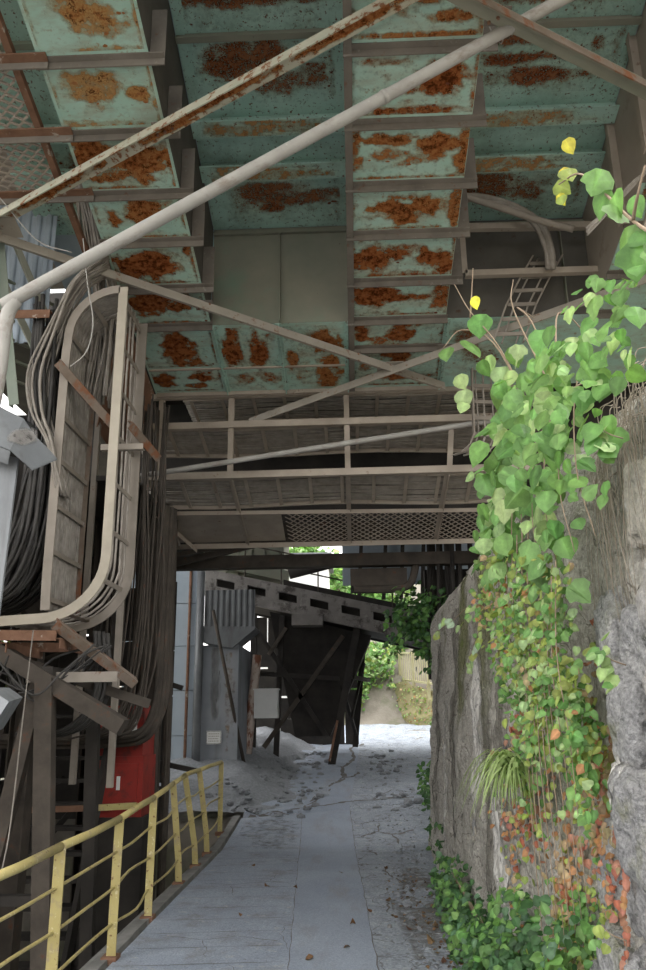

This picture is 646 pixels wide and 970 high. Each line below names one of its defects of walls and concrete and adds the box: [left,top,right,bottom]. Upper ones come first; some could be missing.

corrosion [95,200,168,239]
corrosion [17,0,483,210]
corrosion [110,127,561,392]
corrosion [364,34,593,116]
corrosion [486,110,571,127]
crack [161,743,427,970]